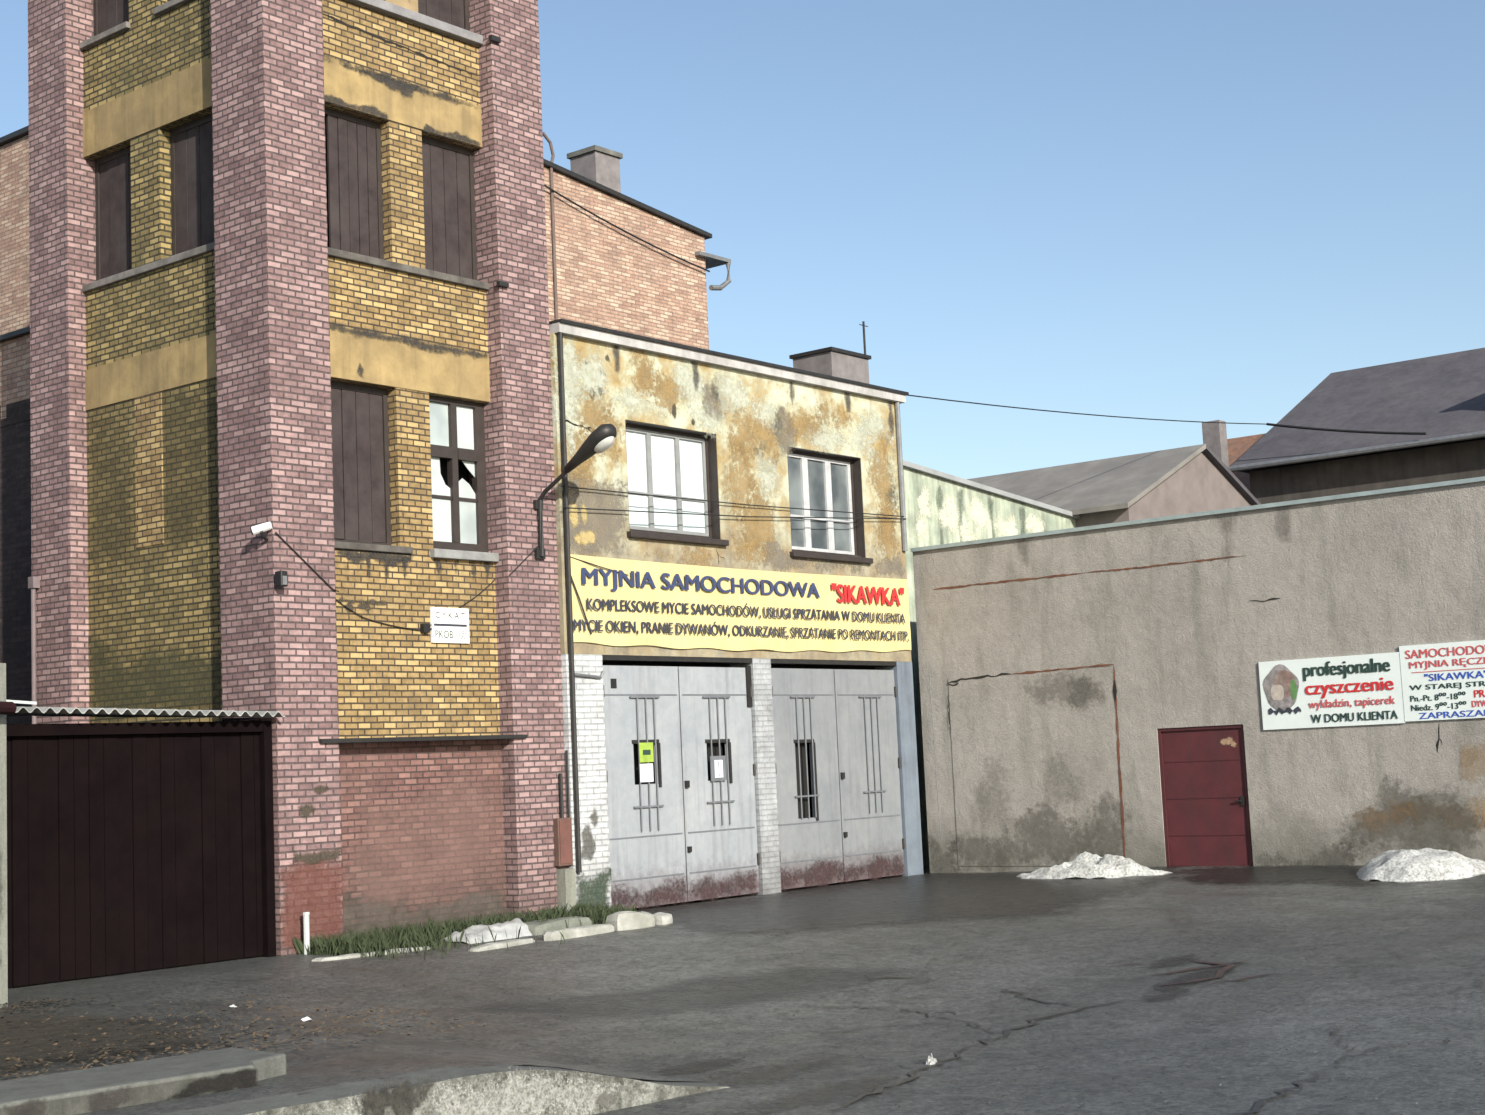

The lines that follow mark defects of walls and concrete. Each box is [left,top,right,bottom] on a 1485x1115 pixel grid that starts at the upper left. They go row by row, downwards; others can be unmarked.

flaking render [552,342,1045,562]
flaking render [661,547,711,567]
rust [611,871,757,908]
rust [781,856,904,890]
crack [833,960,1276,1110]
crack [1232,1023,1480,1115]